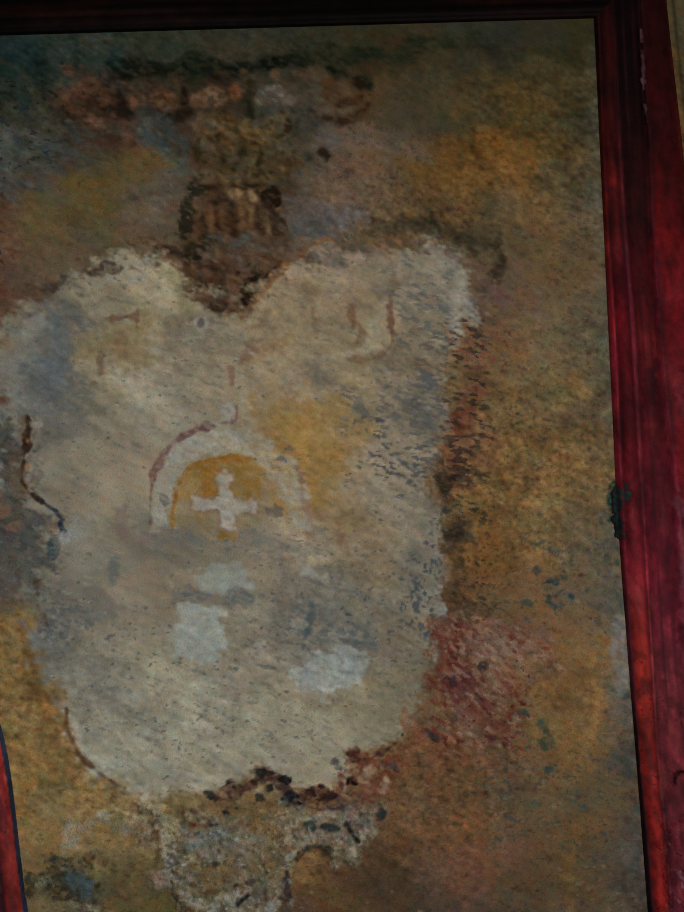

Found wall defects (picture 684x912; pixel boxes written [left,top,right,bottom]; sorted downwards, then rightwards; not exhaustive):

crack [0,413,80,629]
flaking render [0,210,568,912]